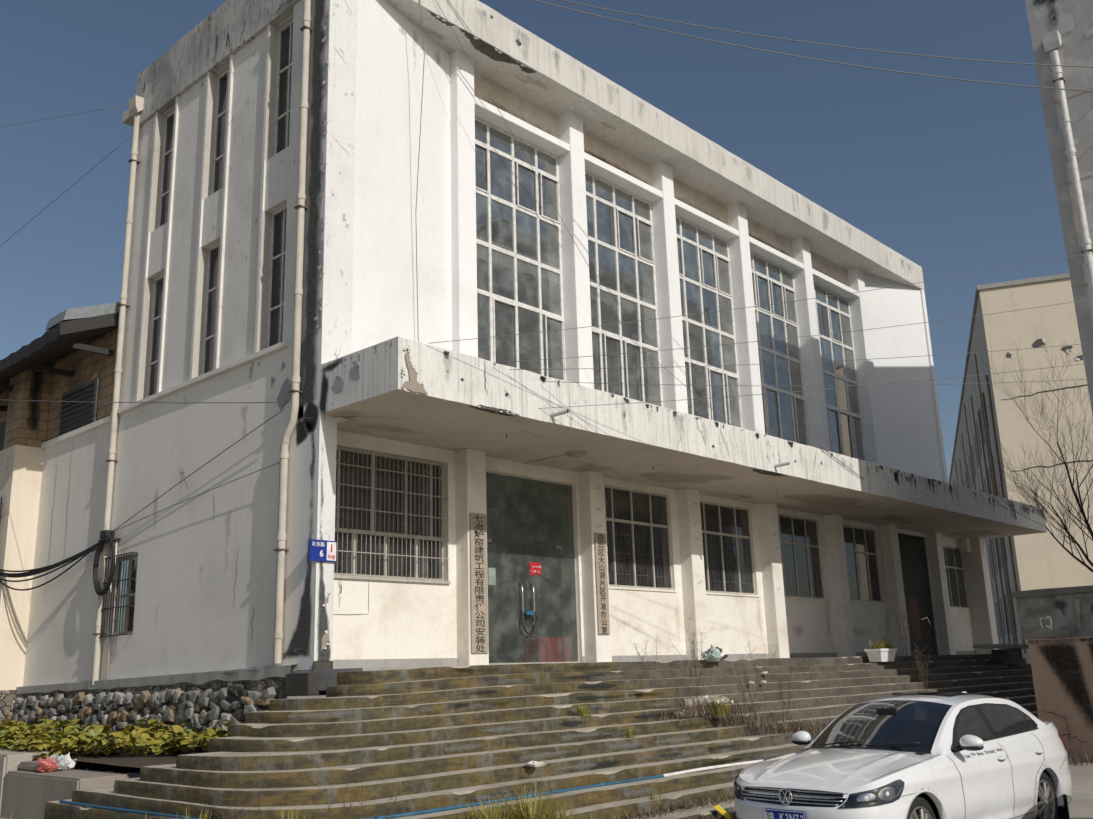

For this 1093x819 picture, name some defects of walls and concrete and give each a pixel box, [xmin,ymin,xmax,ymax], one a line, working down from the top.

peeling [322,11,330,45]
peeling [317,214,325,281]
peeling [314,296,323,330]
peeling [331,358,360,393]
peeling [401,346,429,395]
damp [867,463,958,497]
damp [284,556,330,661]
damp [1029,638,1093,724]